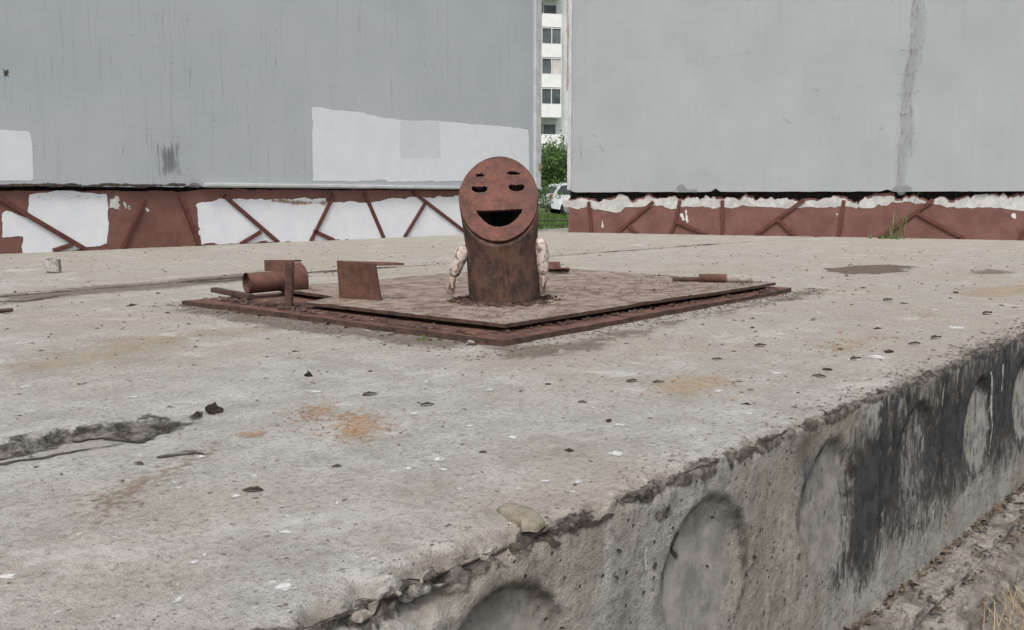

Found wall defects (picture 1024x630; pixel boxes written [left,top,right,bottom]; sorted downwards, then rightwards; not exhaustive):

damp [163,149,174,172]
peeling [562,194,1024,228]
damp [823,264,912,274]
spalling [0,411,203,461]
spalling [252,331,1024,630]
damp [831,339,1024,592]